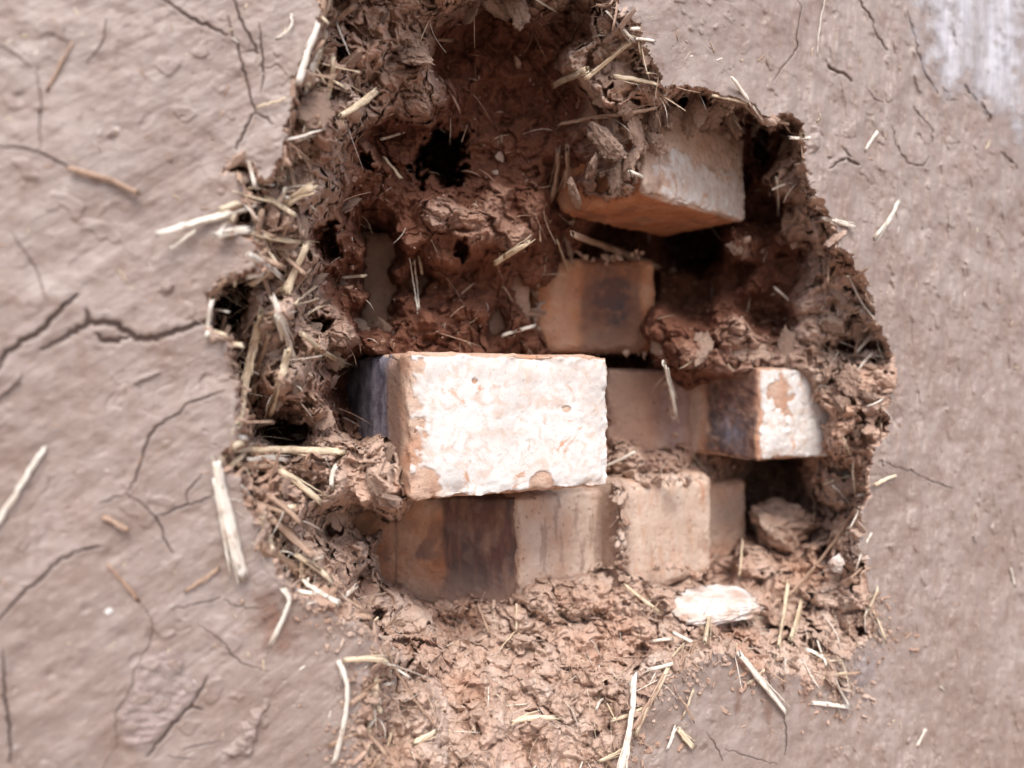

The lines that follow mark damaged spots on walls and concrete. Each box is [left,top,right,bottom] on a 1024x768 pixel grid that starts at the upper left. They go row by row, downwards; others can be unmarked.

crack [0,46,66,166]
crack [164,0,272,150]
crack [830,147,859,169]
crack [859,0,887,50]
crack [892,106,934,166]
crack [907,11,991,119]
crack [0,232,206,368]
spalling [202,0,925,768]
crack [99,390,226,554]
crack [0,546,102,619]
crack [2,649,12,764]
crack [105,597,276,765]